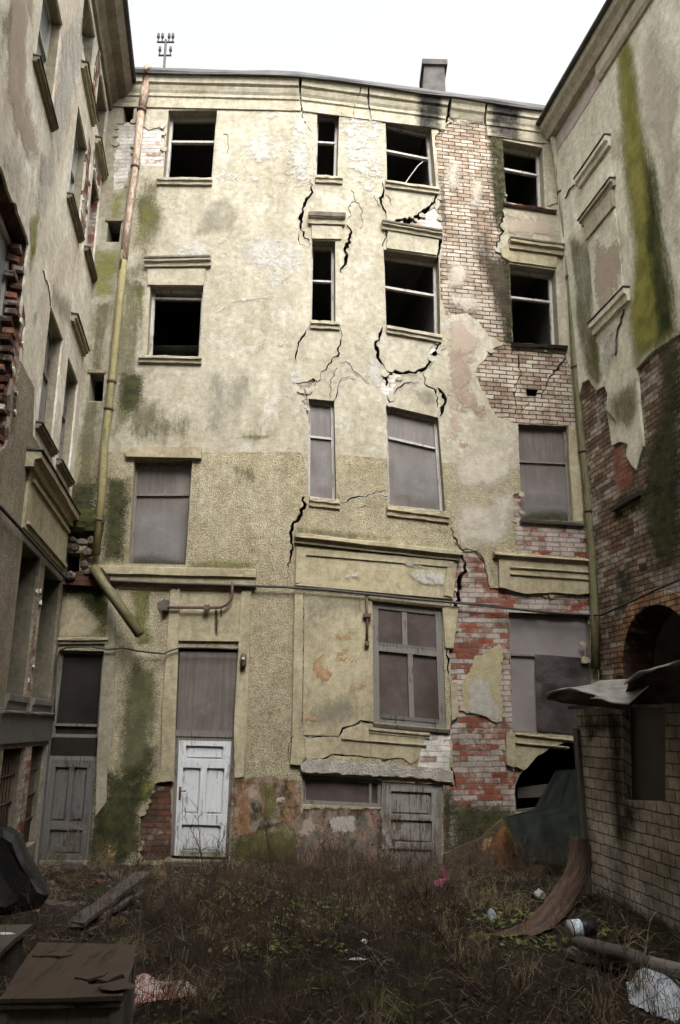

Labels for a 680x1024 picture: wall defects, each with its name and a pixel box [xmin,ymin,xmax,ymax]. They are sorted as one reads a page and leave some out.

flaking render [81,119,167,245]
damp [136,183,159,253]
crack [296,178,314,245]
crack [339,182,440,272]
damp [647,178,671,333]
crack [313,326,449,417]
damp [72,401,180,564]
flaking render [401,119,680,847]
crack [451,530,489,607]
crack [251,497,404,776]
damp [121,661,157,795]
flaking render [135,782,172,862]